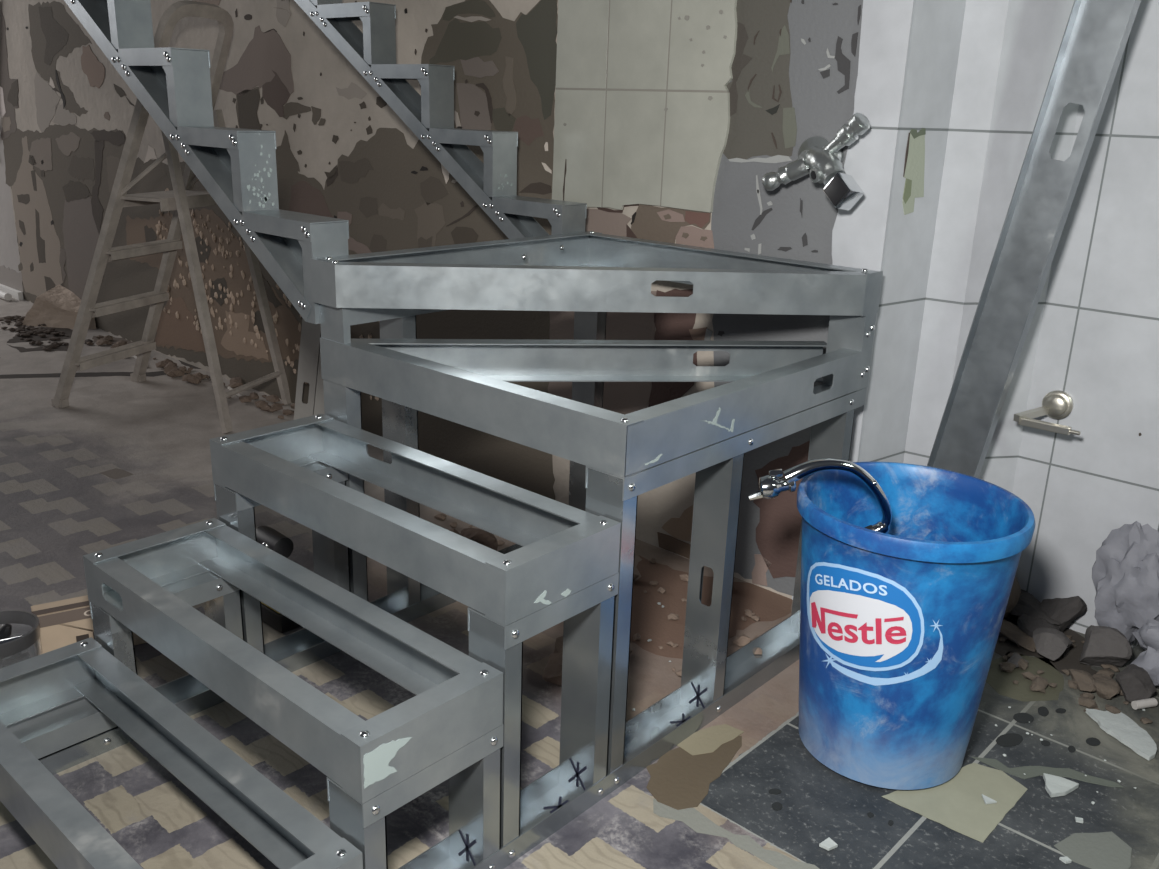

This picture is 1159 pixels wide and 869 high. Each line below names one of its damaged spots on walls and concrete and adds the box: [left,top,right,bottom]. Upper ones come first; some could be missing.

spalling [415,0,555,199]
peeling [723,0,804,159]
spalling [0,1,126,303]
spalling [275,96,509,255]
spalling [95,145,310,404]
spalling [416,309,574,340]
peeling [606,312,725,366]
spalling [361,392,383,437]
spalling [418,411,555,500]
peeling [509,382,572,400]
peeling [603,382,695,415]
spalling [819,838,838,851]